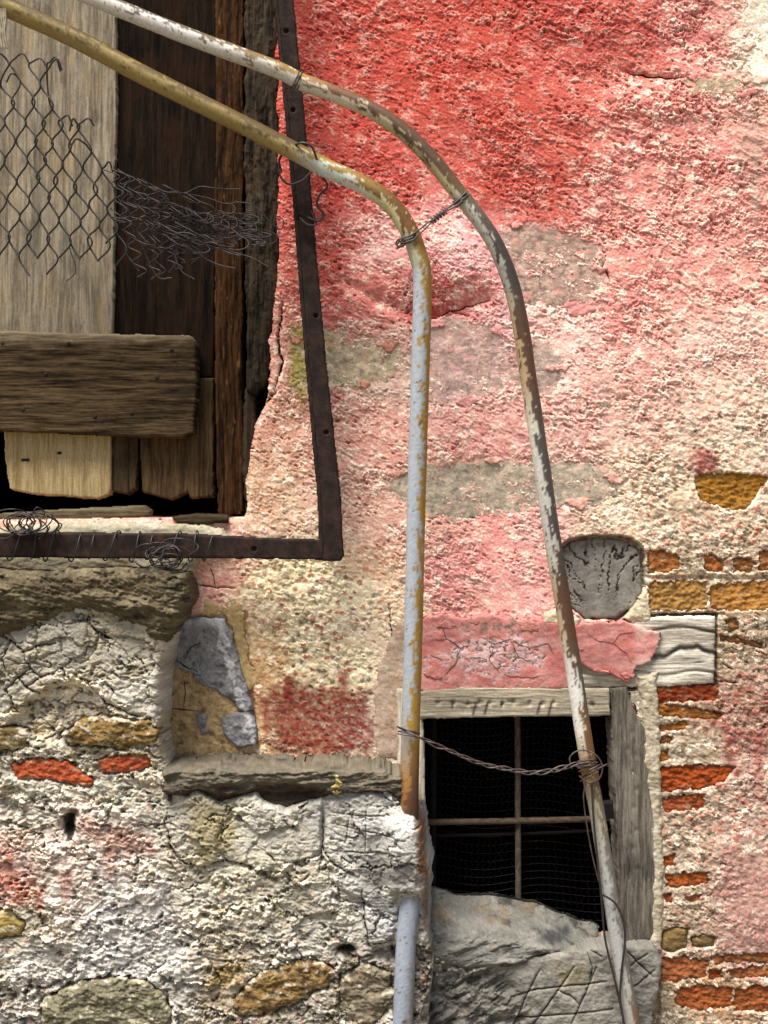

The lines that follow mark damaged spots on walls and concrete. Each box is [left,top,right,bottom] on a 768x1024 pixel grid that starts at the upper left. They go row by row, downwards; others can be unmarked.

crack [630,73,681,81]
crack [266,302,284,403]
crack [0,634,145,717]
crack [86,616,112,639]
peeling [169,598,264,758]
crack [431,628,553,678]